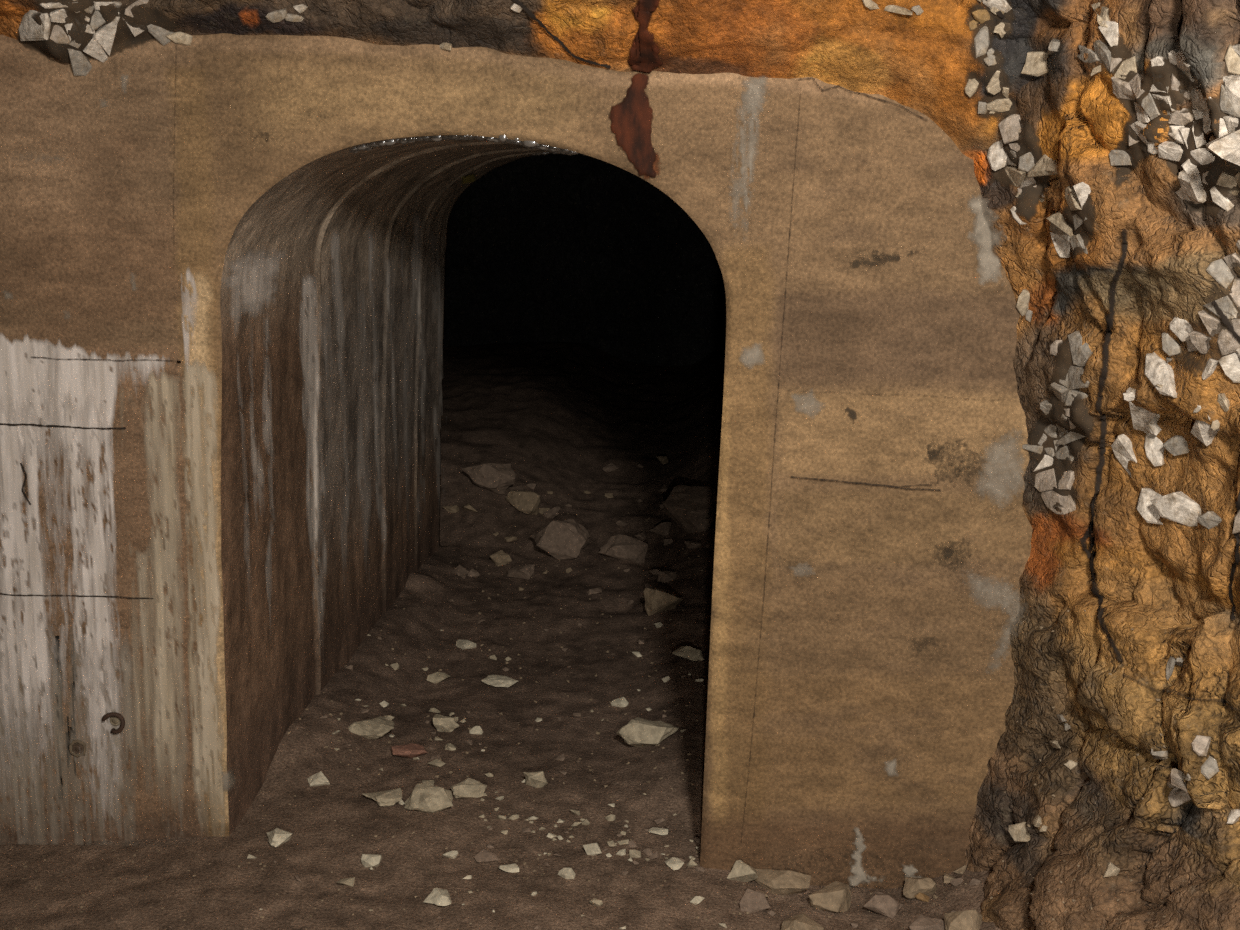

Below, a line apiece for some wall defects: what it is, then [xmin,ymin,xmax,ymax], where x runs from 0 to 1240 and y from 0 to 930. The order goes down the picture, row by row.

rust [609,0,668,179]
leakage [0,271,224,838]